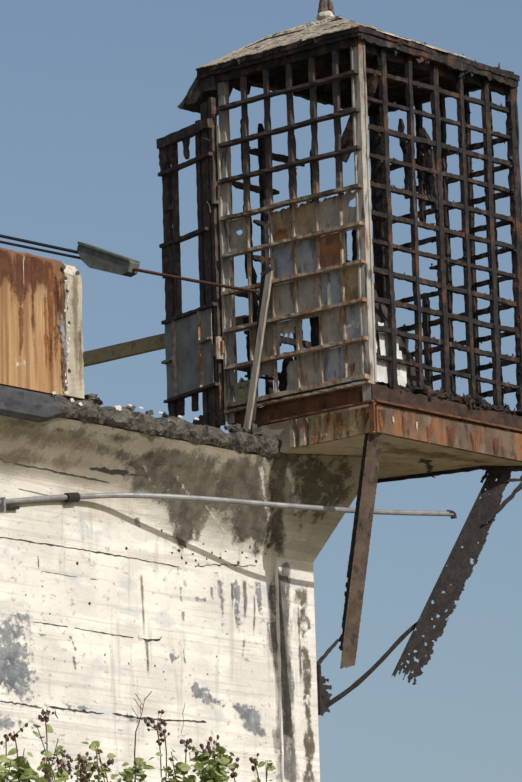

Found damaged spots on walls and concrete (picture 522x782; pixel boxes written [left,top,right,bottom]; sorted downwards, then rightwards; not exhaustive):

corrosion [0,250,66,382]
corrosion [382,422,483,463]
crack [0,537,255,579]
water stain [118,448,354,782]
crack [0,700,207,733]